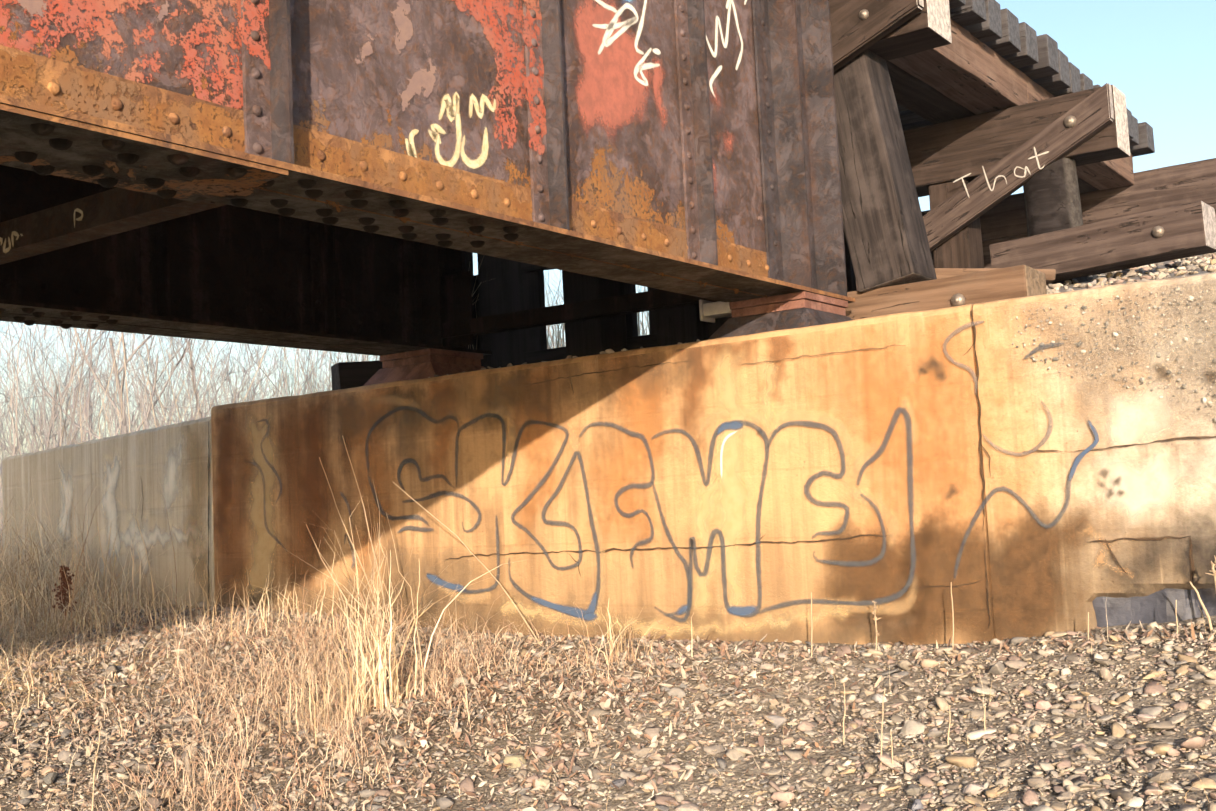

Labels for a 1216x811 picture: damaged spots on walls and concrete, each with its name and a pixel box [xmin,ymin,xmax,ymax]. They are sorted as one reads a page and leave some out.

peeling [0,0,271,152]
peeling [293,0,547,221]
rust [0,156,280,199]
peeling [716,216,768,277]
rust [213,419,254,590]
rust [281,415,335,578]
crack [907,311,991,628]
crack [1023,436,1216,452]
water stain [1113,390,1170,442]
water stain [1109,460,1175,512]
crack [446,534,890,576]
water stain [1182,538,1216,579]